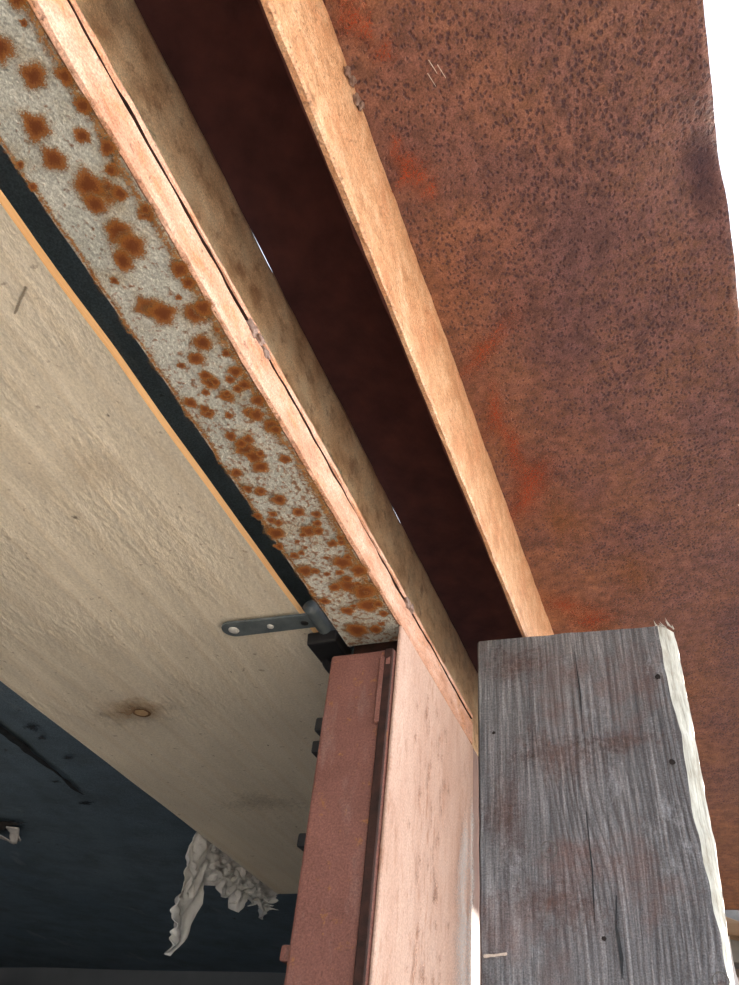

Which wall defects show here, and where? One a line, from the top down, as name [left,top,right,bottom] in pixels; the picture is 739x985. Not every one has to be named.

corrosion [0,0,391,639]
crack [574,651,583,734]
peeling [0,821,24,845]
crack [586,812,623,978]